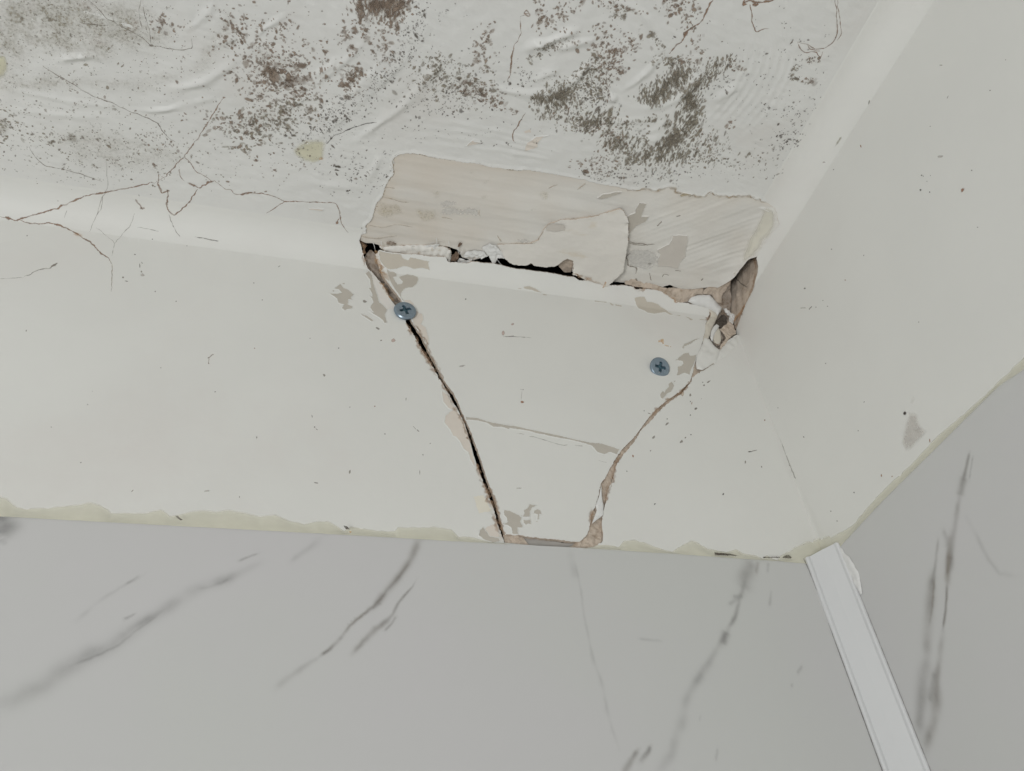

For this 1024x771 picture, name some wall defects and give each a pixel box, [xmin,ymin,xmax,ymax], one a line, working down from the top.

crack [3,66,344,286]
water stain [0,0,829,193]
crack [364,250,400,305]
peeling [329,140,779,543]
crack [477,385,688,548]